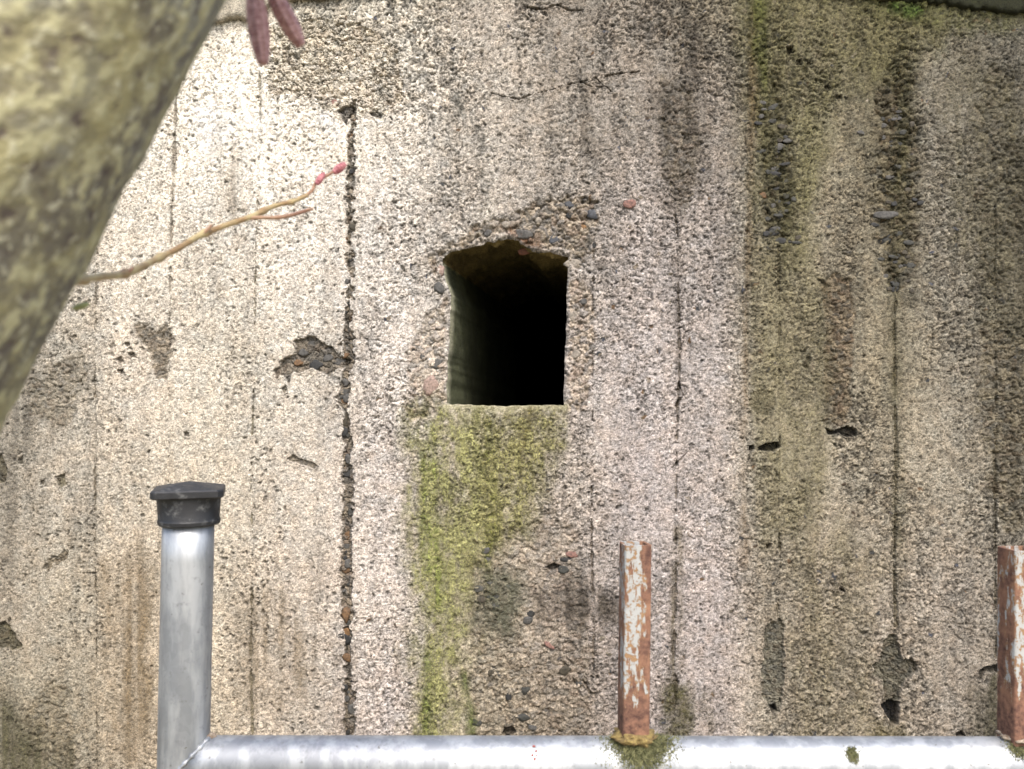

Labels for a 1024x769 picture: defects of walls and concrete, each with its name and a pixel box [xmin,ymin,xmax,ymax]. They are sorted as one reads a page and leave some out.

crack [489,69,642,102]
spalling [272,302,350,438]
spalling [0,621,23,652]